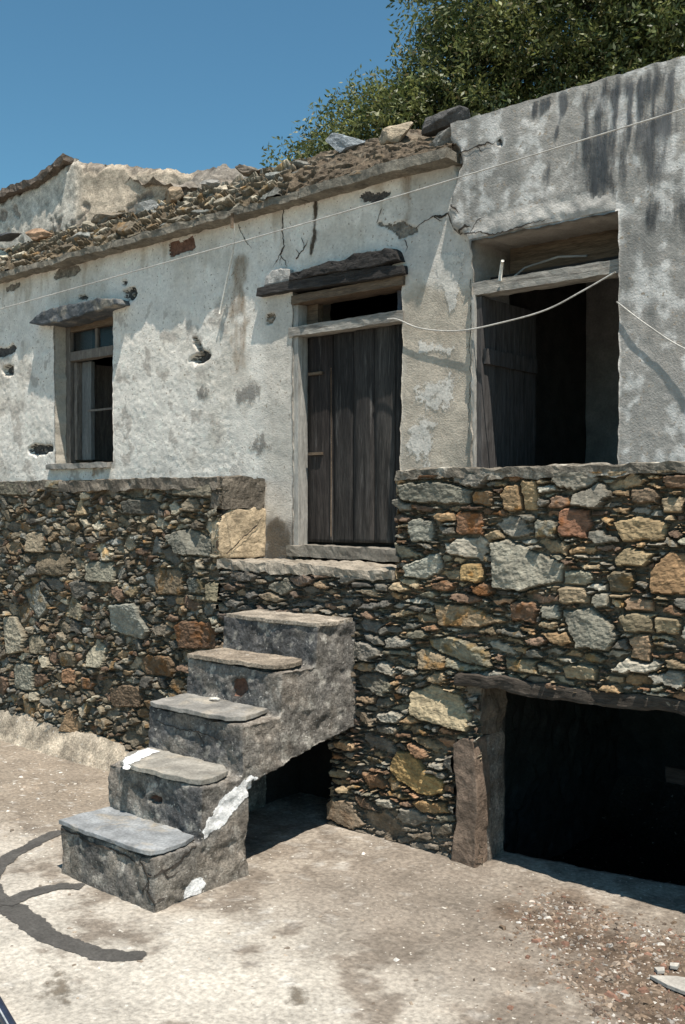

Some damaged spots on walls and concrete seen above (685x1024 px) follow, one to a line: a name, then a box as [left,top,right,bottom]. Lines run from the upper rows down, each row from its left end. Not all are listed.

water stain [532,92,568,138]
water stain [582,68,677,199]
flaking render [169,236,196,257]
crack [275,210,307,266]
flaking render [360,191,390,203]
crack [404,141,558,248]
water stain [646,204,657,228]
flaking render [54,265,81,280]